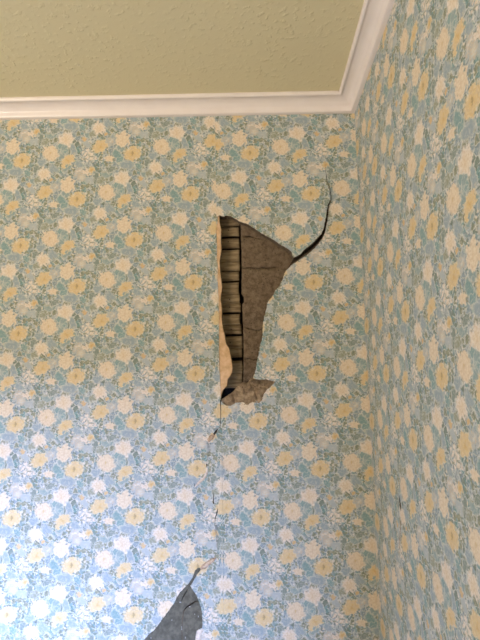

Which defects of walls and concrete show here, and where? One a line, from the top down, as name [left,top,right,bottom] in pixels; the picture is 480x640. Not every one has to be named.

crack [287,170,331,269]
flaking render [216,216,299,408]
flaking render [144,568,203,640]